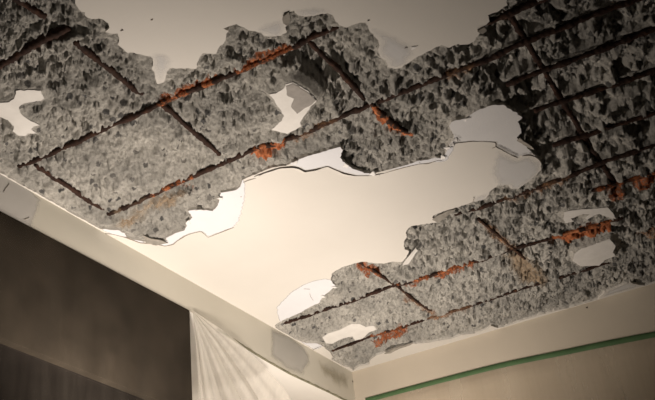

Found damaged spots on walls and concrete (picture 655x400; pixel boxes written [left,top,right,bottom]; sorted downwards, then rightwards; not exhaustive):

spalling [0,24,71,69]
spalling [73,40,144,96]
spalling [376,0,655,105]
spalling [505,26,655,162]
corrosion [372,107,413,136]
corrosion [251,137,286,161]
spalling [34,164,102,210]
peeling [161,180,245,246]
corrosion [552,219,612,243]
corrosion [356,262,382,278]
corrosion [409,260,473,287]
corrosion [370,325,407,348]